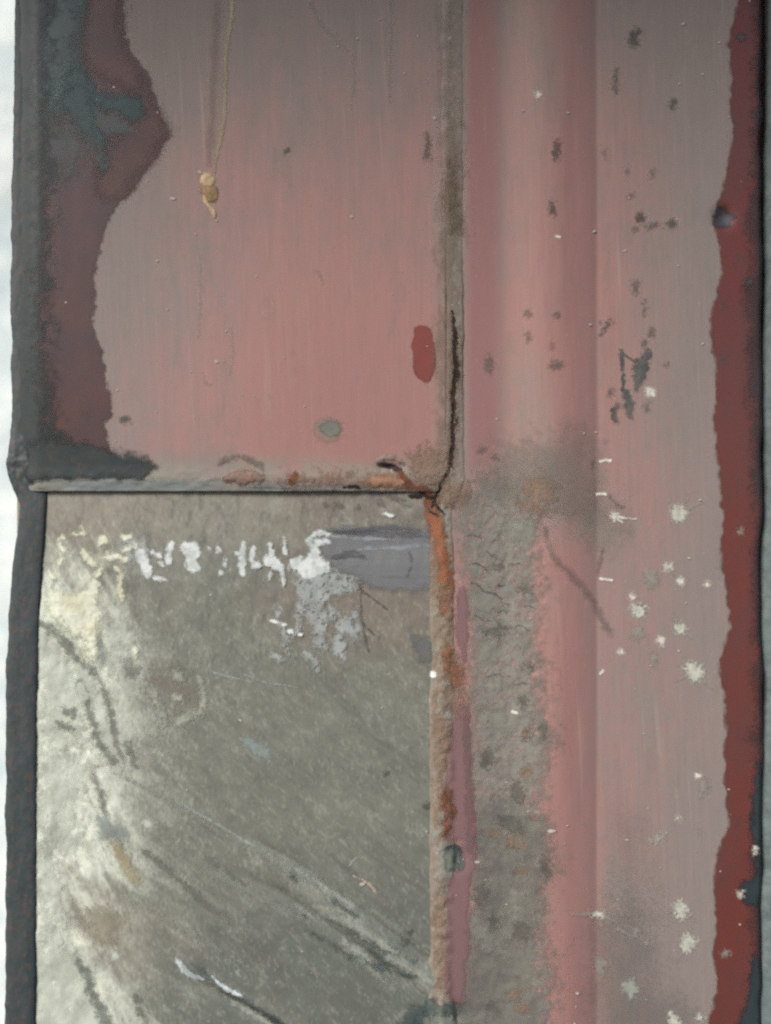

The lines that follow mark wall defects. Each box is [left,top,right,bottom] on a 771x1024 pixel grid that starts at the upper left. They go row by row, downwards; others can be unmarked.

leakage [31,0,171,455]
rust [200,0,234,218]
crack [408,310,460,516]
spalling [712,207,736,228]
peeling [36,512,431,1024]
rust [277,470,469,844]